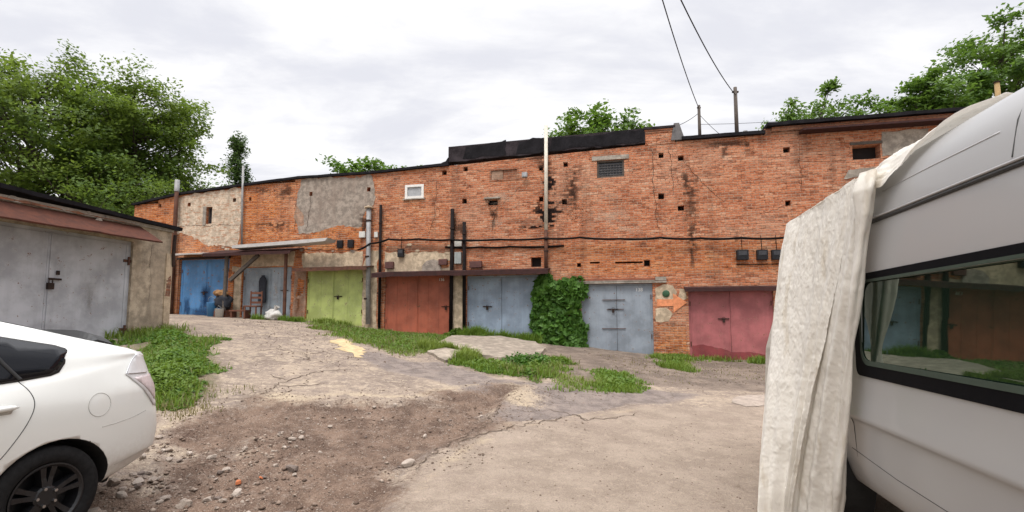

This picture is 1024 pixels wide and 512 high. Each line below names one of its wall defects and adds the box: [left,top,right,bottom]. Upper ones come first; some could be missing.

damp [524,162,577,229]
crack [633,146,723,228]
spalling [299,223,363,253]